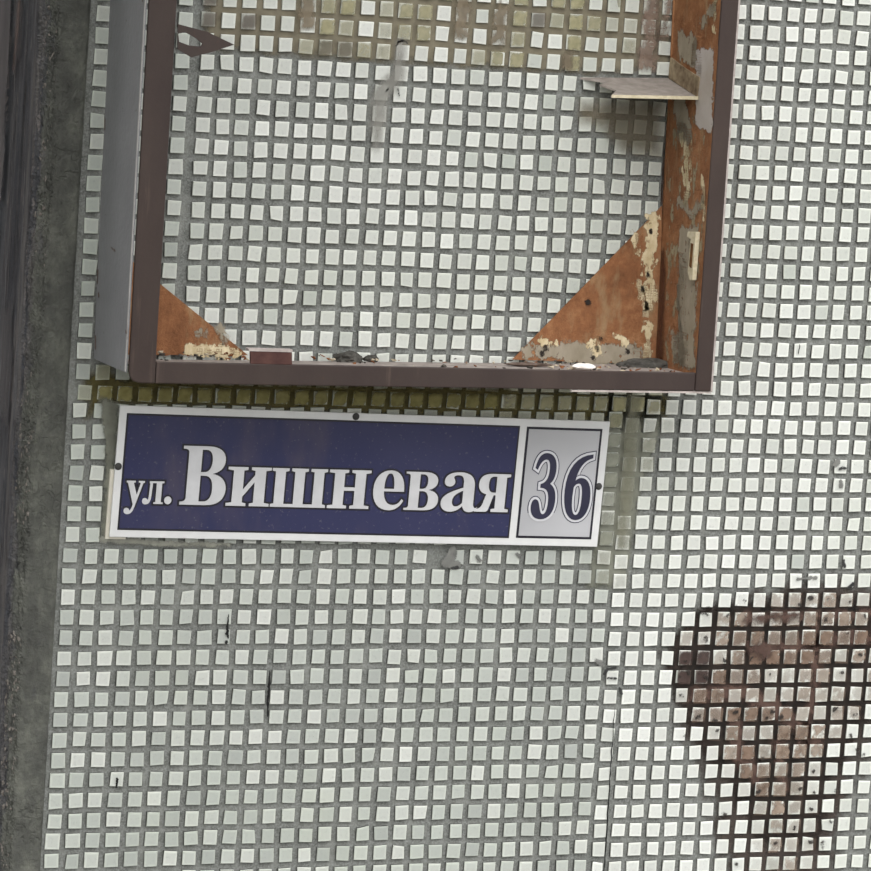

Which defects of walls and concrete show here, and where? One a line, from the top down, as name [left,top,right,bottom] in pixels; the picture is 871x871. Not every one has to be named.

corrosion [656,250,665,360]
crack [603,712,615,871]
corrosion [665,579,871,871]